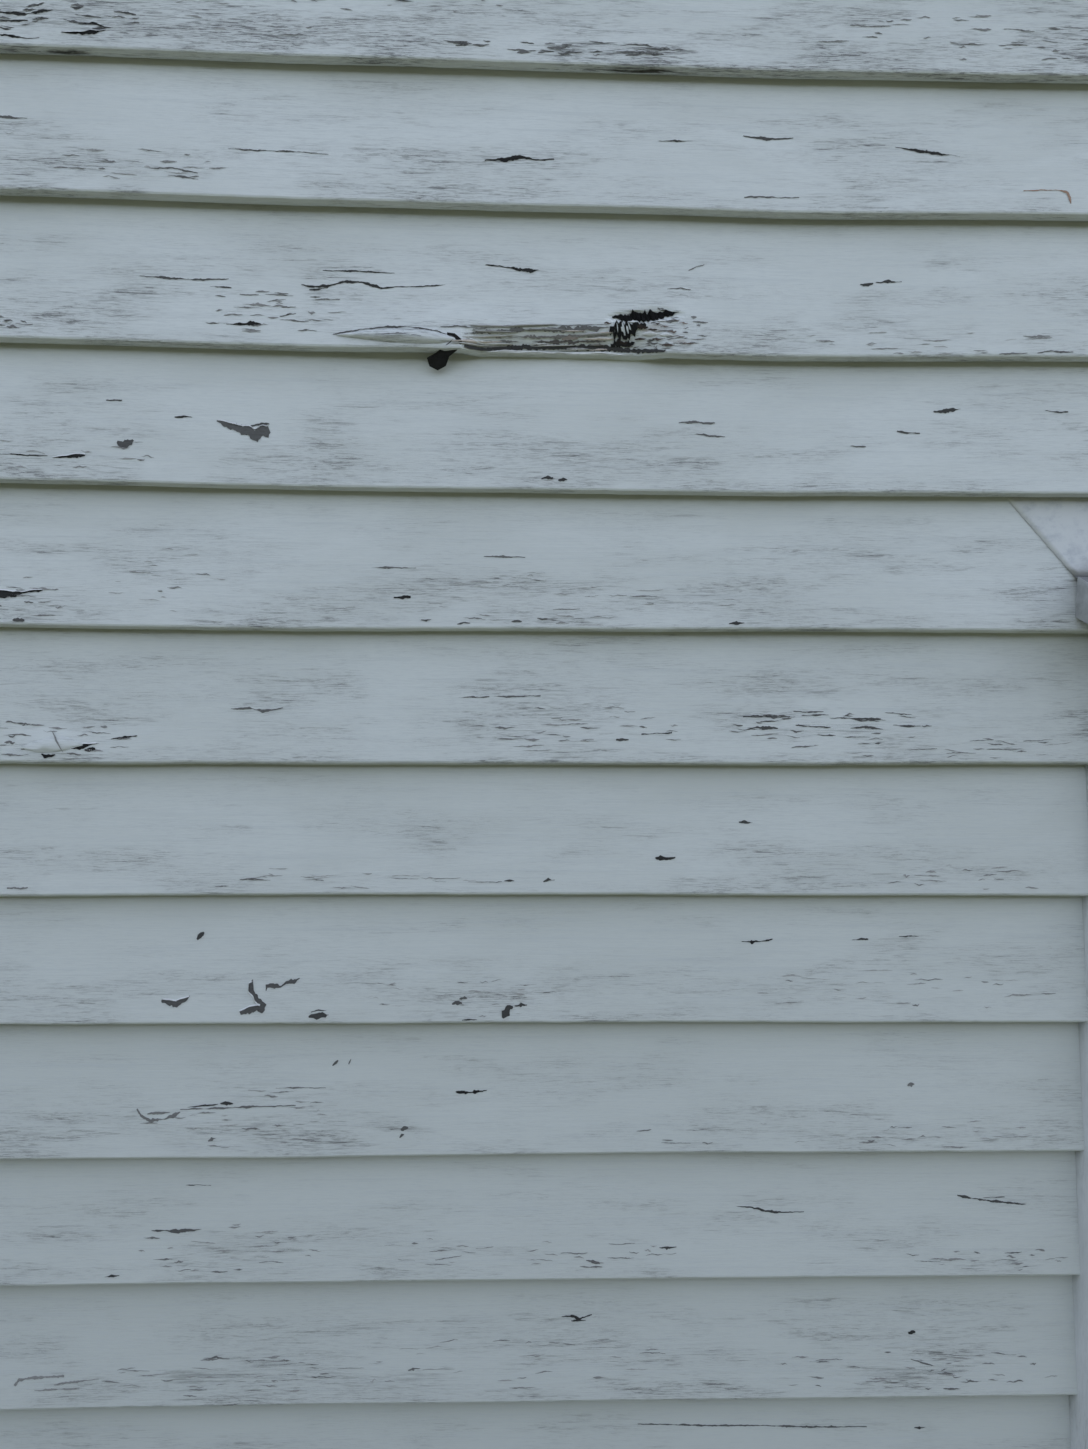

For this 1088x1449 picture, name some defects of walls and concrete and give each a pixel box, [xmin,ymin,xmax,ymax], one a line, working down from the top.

peeling [0,2,140,39]
peeling [509,41,683,56]
peeling [822,16,930,42]
peeling [951,15,1088,60]
peeling [627,308,708,349]
peeling [217,419,270,442]
peeling [0,577,65,622]
peeling [161,996,189,1007]
peeling [239,978,300,1015]
peeling [308,1009,327,1020]
crack [737,1205,804,1213]
crack [957,1195,1024,1205]